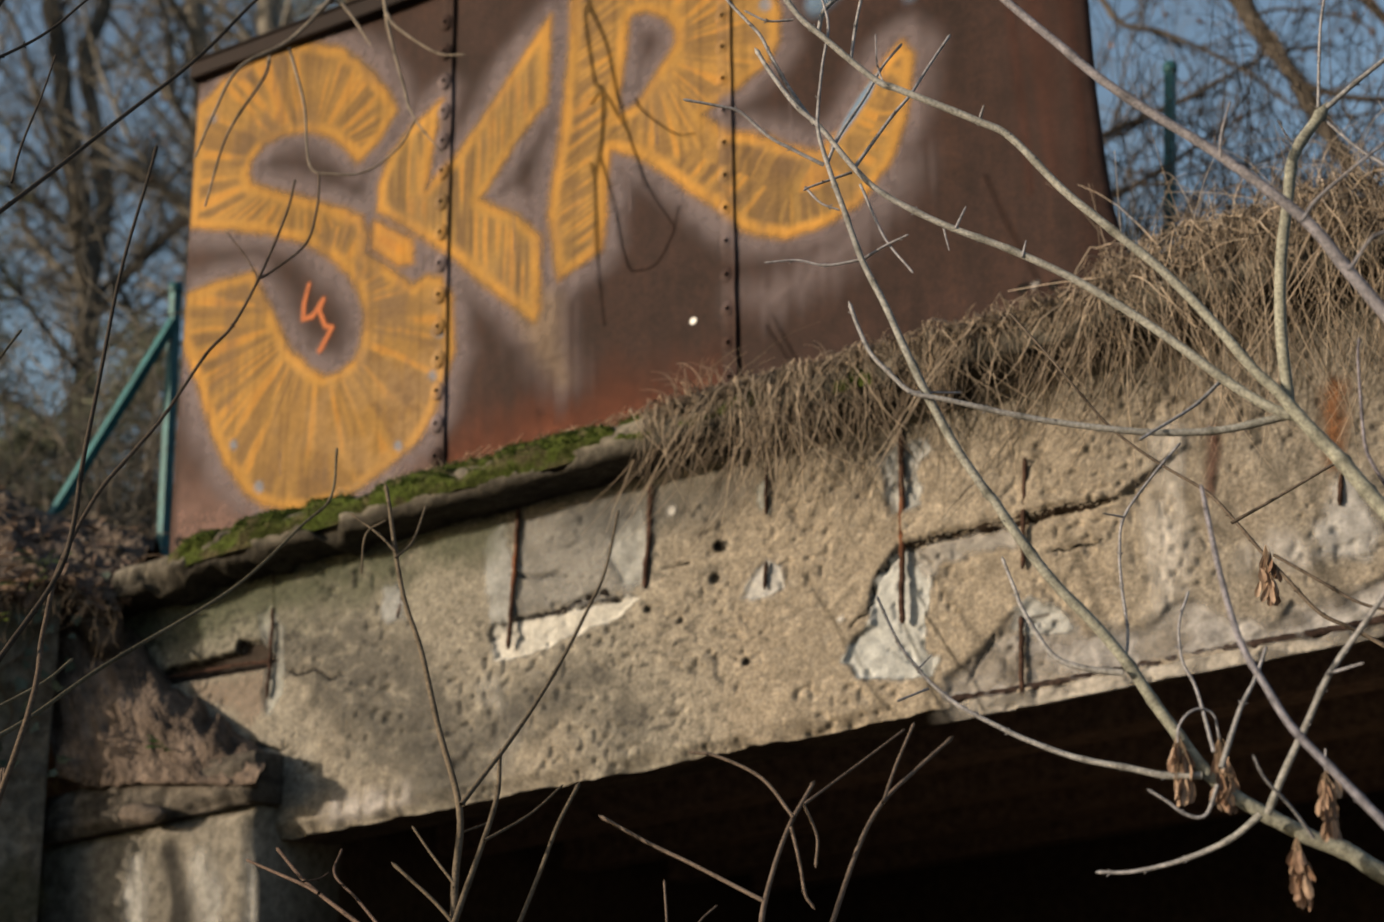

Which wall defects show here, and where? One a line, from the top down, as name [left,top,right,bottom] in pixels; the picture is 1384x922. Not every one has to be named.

rust [450,396,660,464]
rust [175,483,252,549]
spalling [485,484,654,662]
spalling [712,539,724,552]
spalling [756,464,769,515]
spalling [744,560,784,600]
spalling [841,420,1017,680]
crack [905,458,1116,569]
spalling [165,572,285,715]
crack [288,668,344,681]